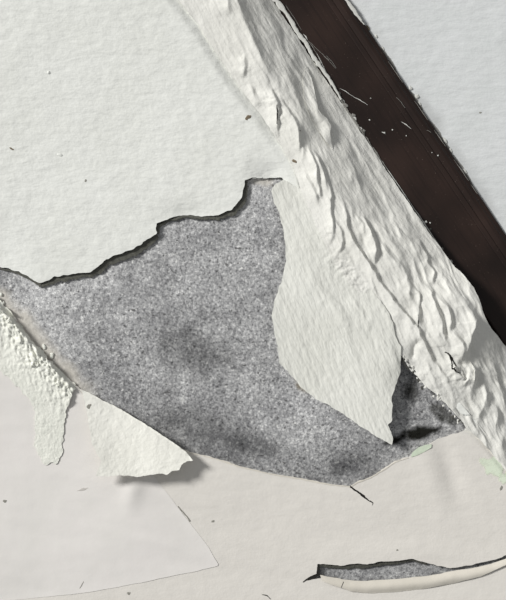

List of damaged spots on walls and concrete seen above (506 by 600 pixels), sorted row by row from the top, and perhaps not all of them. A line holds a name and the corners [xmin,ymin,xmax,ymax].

peeling [0,178,466,600]
water stain [385,406,456,444]
spalling [309,555,506,581]